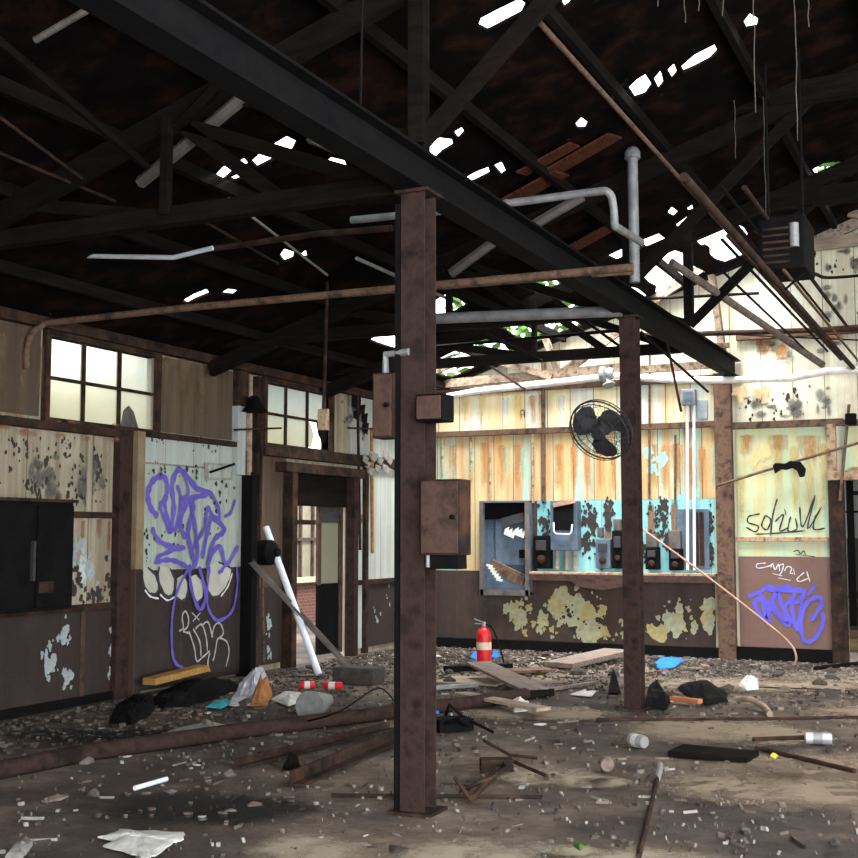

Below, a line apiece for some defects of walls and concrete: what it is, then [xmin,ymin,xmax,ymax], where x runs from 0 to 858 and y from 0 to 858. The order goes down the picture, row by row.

damp [838,249,858,271]
damp [823,285,847,318]
damp [744,397,802,418]
damp [817,387,831,414]
peeling [4,436,108,507]
corrosion [499,445,519,472]
corrosion [572,446,601,484]
corrosion [792,436,825,502]
peeling [581,496,616,559]
peeling [72,536,111,604]
peeling [503,585,623,643]
peeling [40,614,74,690]